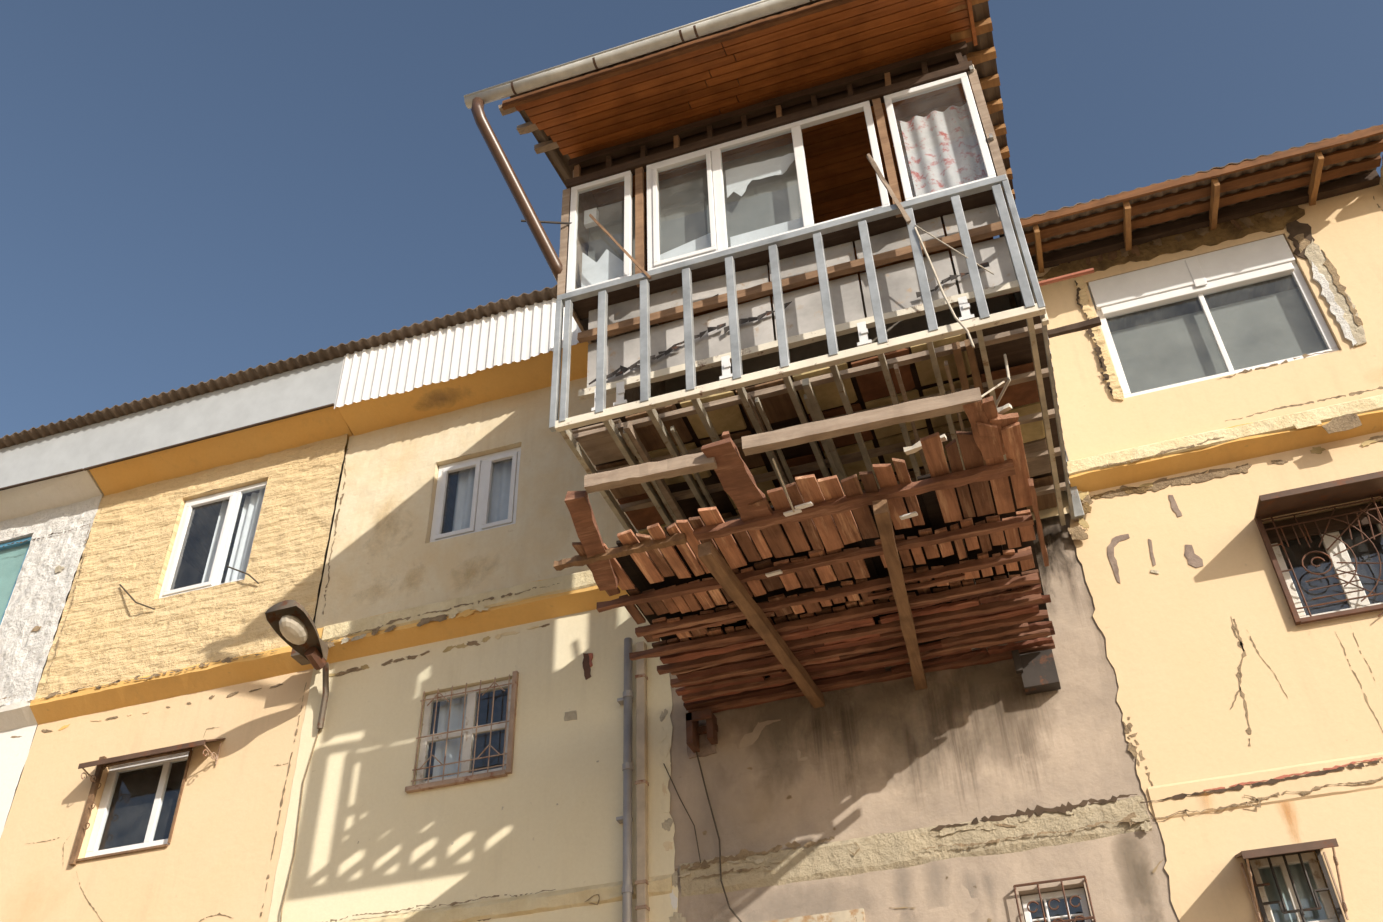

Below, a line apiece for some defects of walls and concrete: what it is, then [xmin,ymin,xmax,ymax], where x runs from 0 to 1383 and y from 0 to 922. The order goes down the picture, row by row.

spalling [1037,205,1367,401]
crack [1075,280,1113,396]
spalling [1294,414,1383,454]
spalling [1068,463,1252,540]
peeling [1107,534,1130,583]
peeling [1148,539,1159,574]
peeling [1184,545,1203,568]
crack [915,617,1383,851]
spalling [936,815,1028,836]
spalling [1121,812,1153,832]